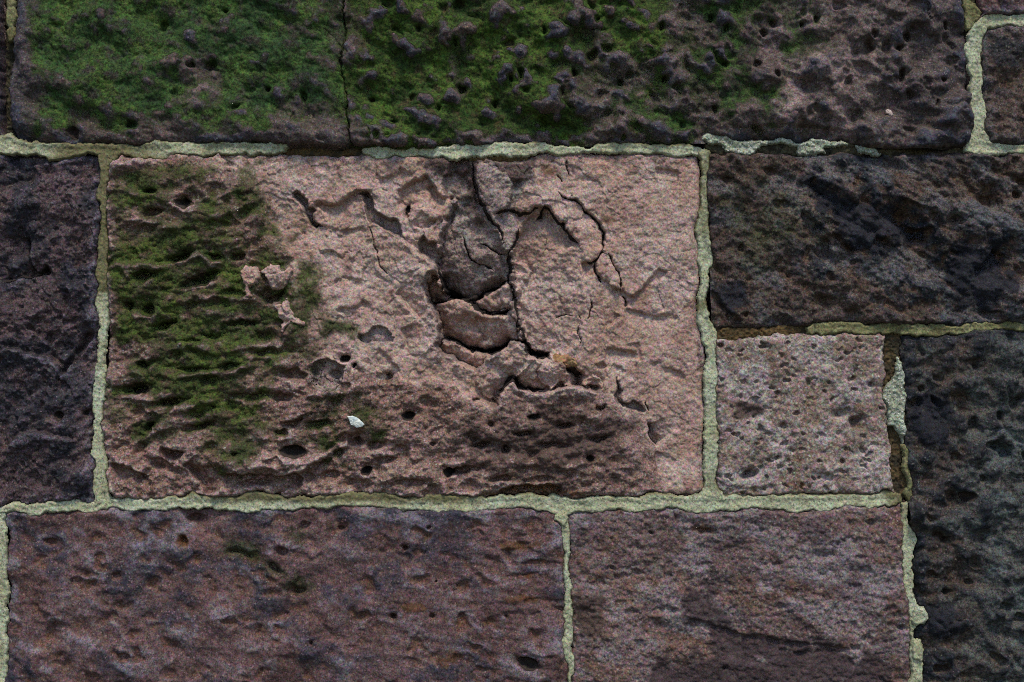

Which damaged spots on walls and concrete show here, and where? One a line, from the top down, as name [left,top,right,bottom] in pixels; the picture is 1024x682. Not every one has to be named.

spalling [176,146,704,496]
crack [464,161,626,354]